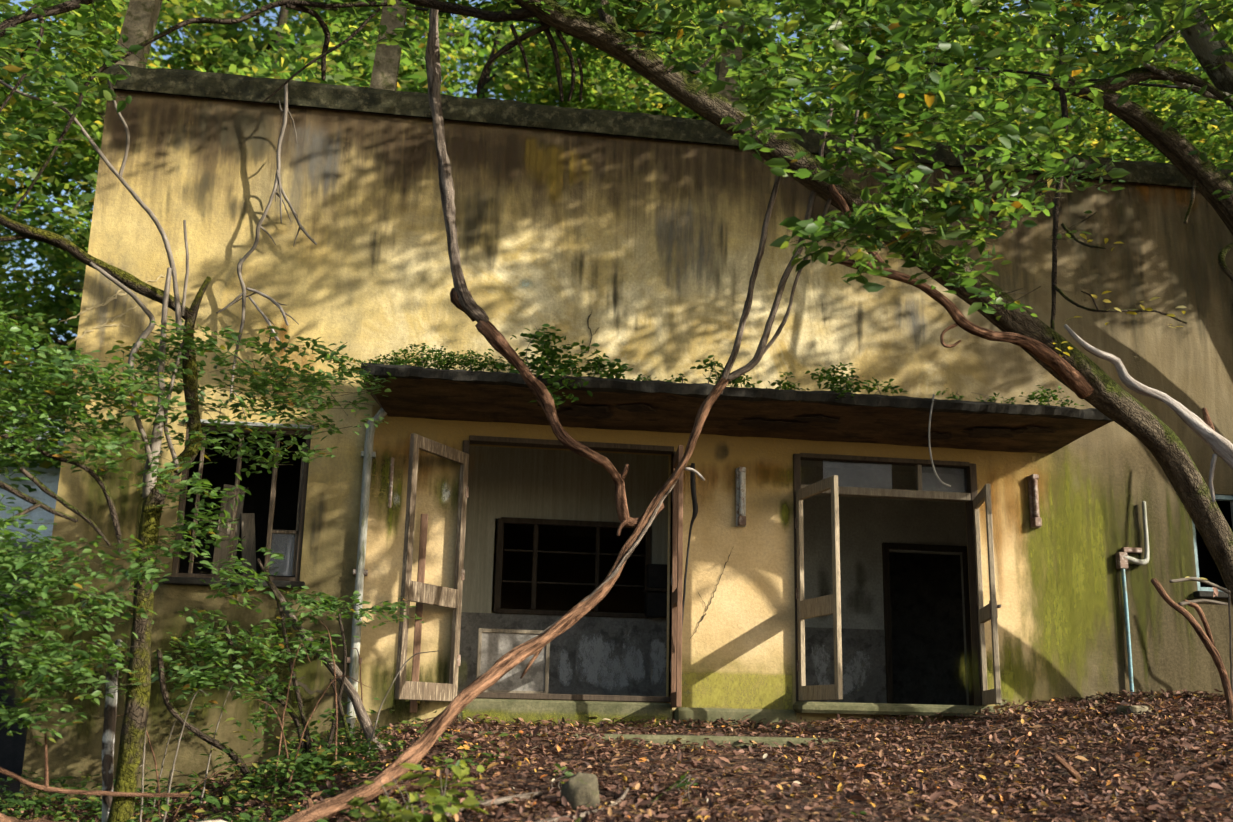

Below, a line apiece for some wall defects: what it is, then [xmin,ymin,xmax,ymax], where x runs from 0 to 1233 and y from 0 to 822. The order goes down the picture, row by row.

water stain [112,101,267,183]
water stain [371,454,402,535]
crack [691,548,733,637]
water stain [974,464,1157,705]
water stain [1167,498,1193,633]